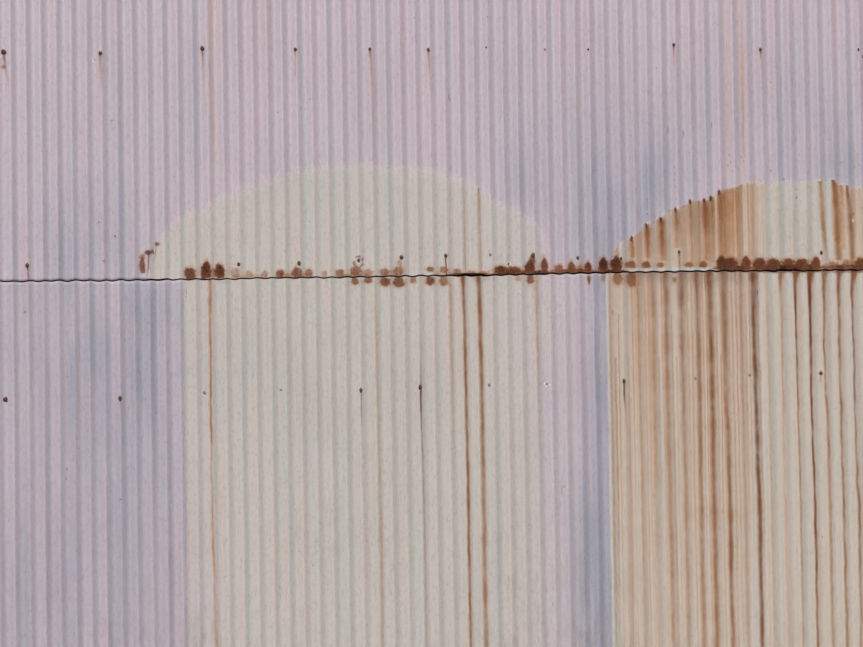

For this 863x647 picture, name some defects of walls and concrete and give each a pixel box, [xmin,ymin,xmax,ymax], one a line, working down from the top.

rust [139,242,159,273]
rust [276,267,312,277]
rust [336,207,683,568]
rust [679,180,863,647]